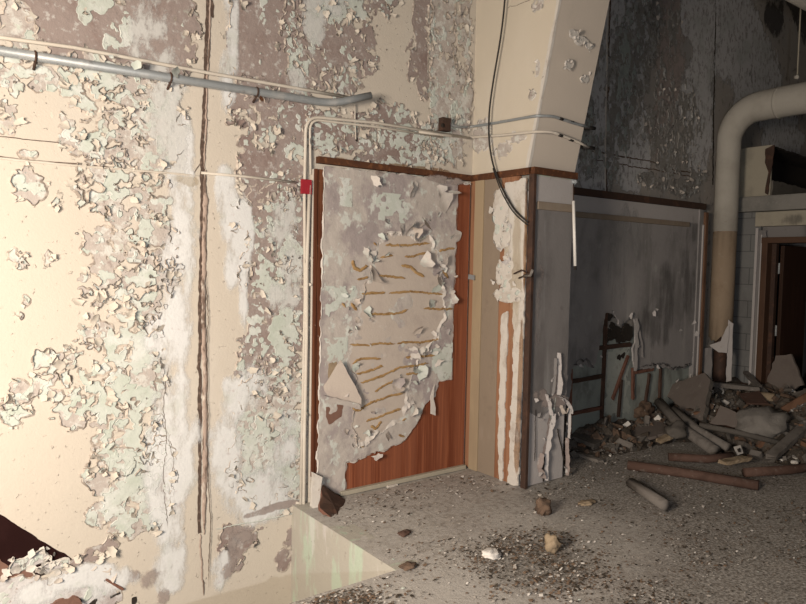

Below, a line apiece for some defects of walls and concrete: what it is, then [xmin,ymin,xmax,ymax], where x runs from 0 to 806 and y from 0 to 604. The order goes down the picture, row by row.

crack [0,0,211,595]
peeling [339,494,502,550]